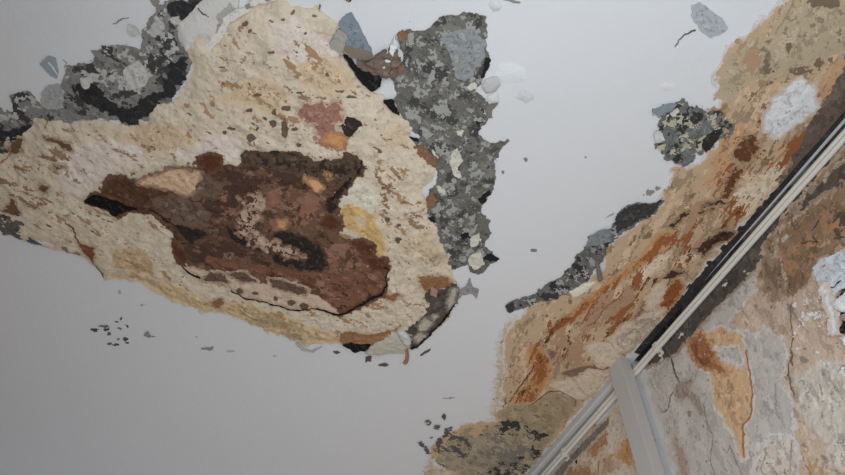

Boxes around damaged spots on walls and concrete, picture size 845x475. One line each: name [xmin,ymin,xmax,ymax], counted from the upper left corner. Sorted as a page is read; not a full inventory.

peeling [178,0,276,52]
spalling [329,12,509,300]
flaking render [84,106,391,317]
corrosion [338,203,389,258]
water stain [418,0,845,475]
peeling [333,328,411,367]
water stain [405,282,460,350]
crack [663,348,680,413]
corrosion [685,324,756,463]
crack [703,404,768,475]
crack [775,305,795,419]
flaking render [811,249,845,345]